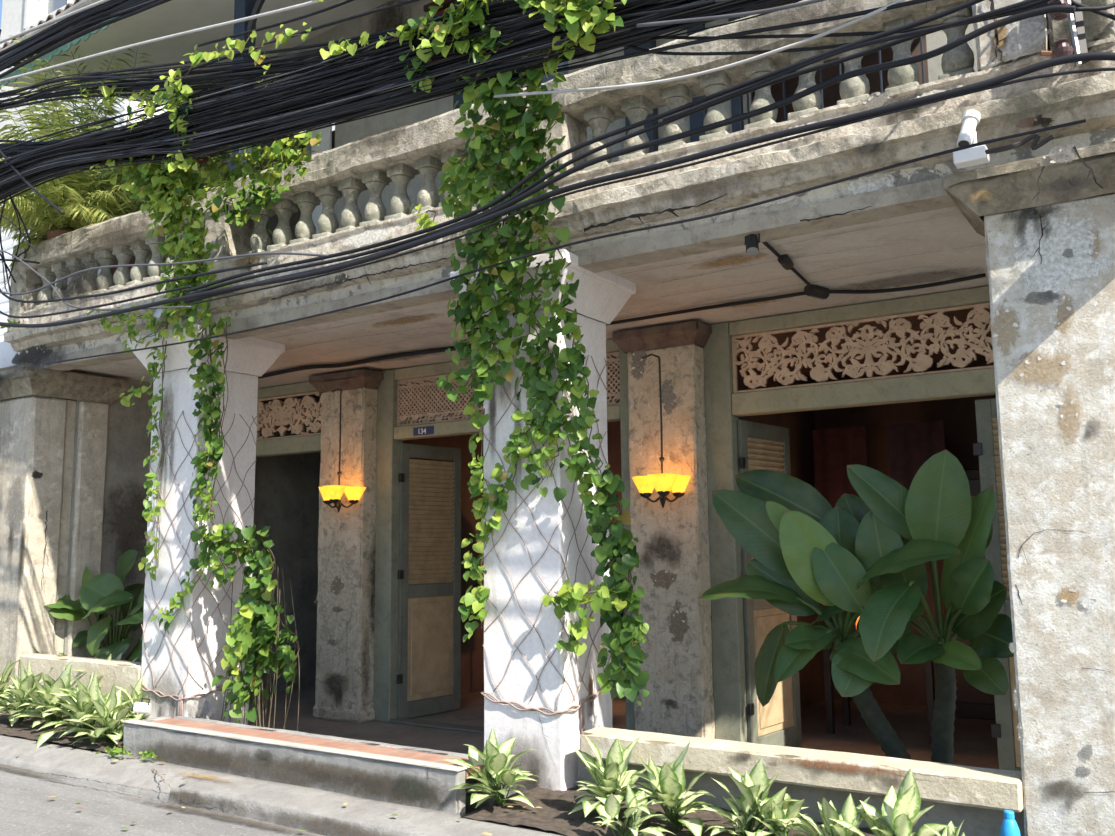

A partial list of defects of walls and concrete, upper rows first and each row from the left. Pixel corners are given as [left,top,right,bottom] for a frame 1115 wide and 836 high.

crack [1073,146,1103,189]
crack [584,194,727,232]
damp [1011,199,1052,220]
crack [1033,166,1048,264]
peeling [1013,207,1110,332]
spalling [992,300,1081,443]
crack [41,511,50,591]
damp [648,536,677,560]
crack [1015,529,1091,604]
damp [325,675,346,697]
damp [1047,781,1086,808]